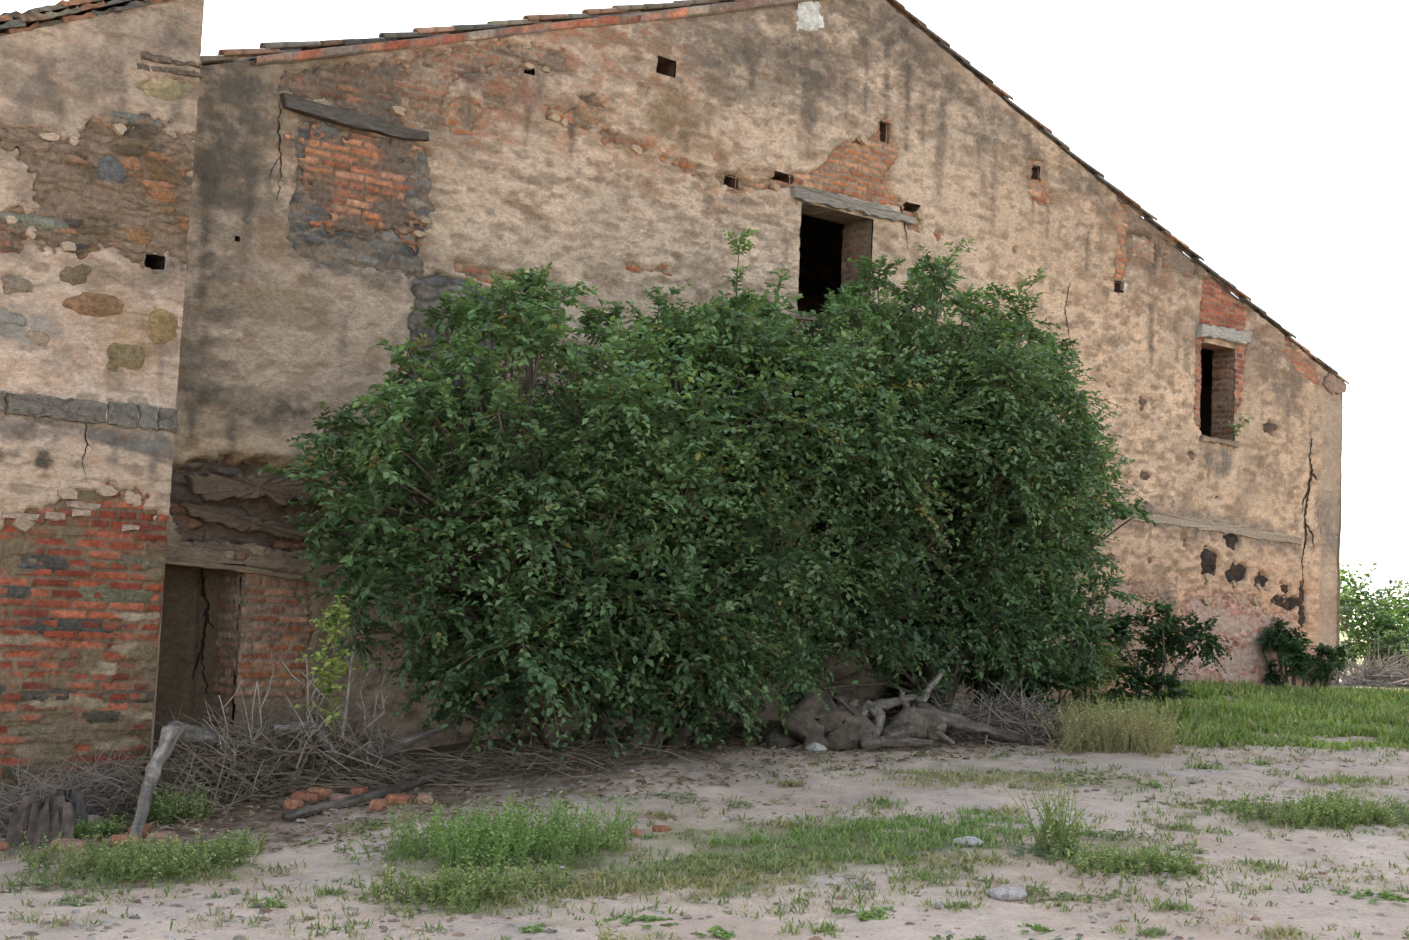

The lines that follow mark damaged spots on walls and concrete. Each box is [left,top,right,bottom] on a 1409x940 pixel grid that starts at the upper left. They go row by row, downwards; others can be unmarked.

spalling [0,77,194,276]
flaking render [277,39,567,432]
flaking render [545,107,941,241]
flaking render [1113,200,1248,428]
crack [1301,438,1317,584]
flaking render [0,482,168,820]
crack [192,568,215,694]
spalling [50,838,88,852]